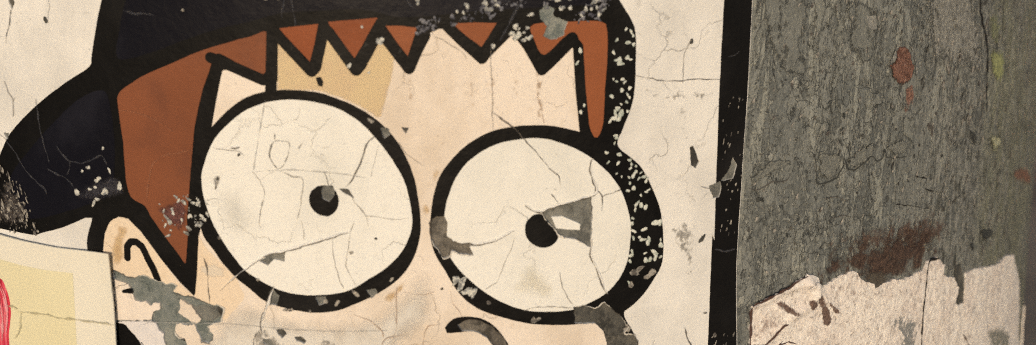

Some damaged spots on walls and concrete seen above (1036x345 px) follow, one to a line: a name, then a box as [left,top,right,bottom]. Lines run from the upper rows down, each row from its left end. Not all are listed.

corrosion [890,43,918,112]
corrosion [820,214,944,288]